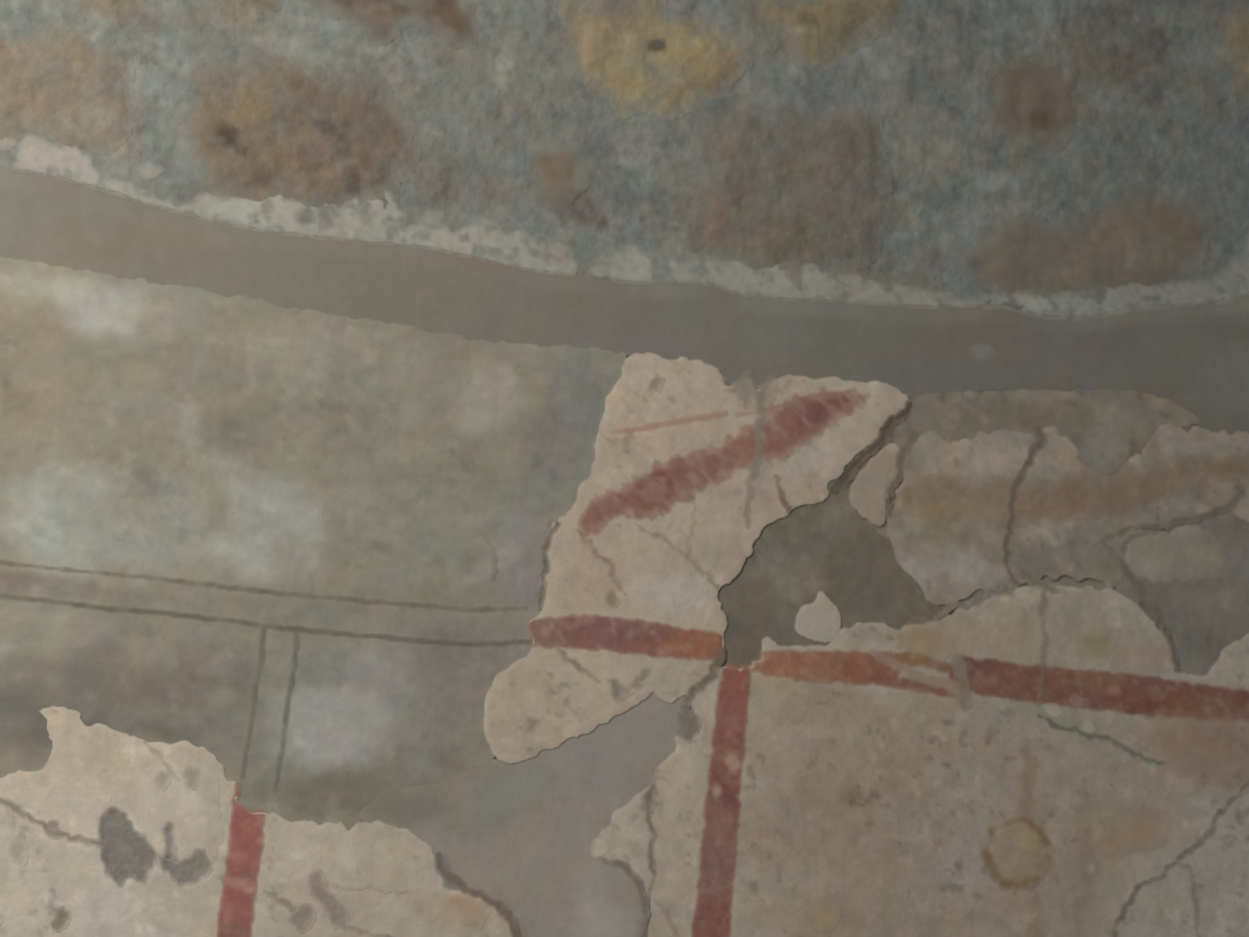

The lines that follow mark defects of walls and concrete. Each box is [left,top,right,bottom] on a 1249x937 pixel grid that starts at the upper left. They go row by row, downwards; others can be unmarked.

damp [249,0,482,49]
damp [987,61,1076,154]
damp [0,134,1249,323]
crack [933,426,1167,766]
crack [1099,487,1246,670]
spalling [607,668,651,703]
spalling [677,704,702,743]
crack [868,647,972,711]
spalling [286,868,350,934]
crack [1112,781,1249,937]